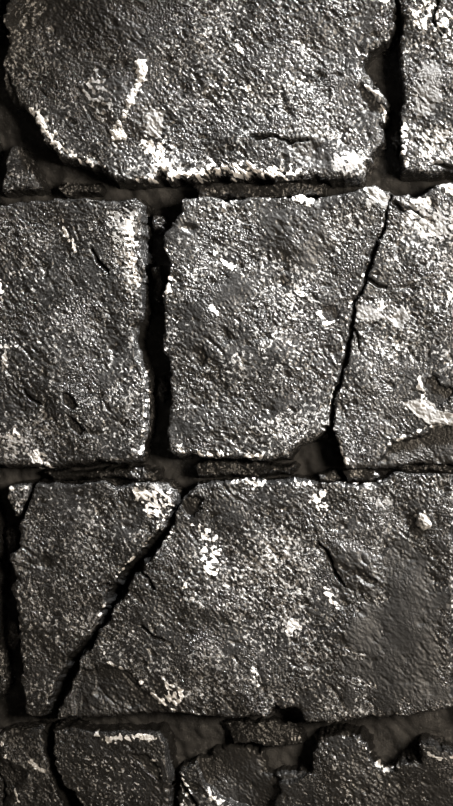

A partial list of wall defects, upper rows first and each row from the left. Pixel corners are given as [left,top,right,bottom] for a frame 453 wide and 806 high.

crack [328,197,412,429]
crack [42,493,187,806]